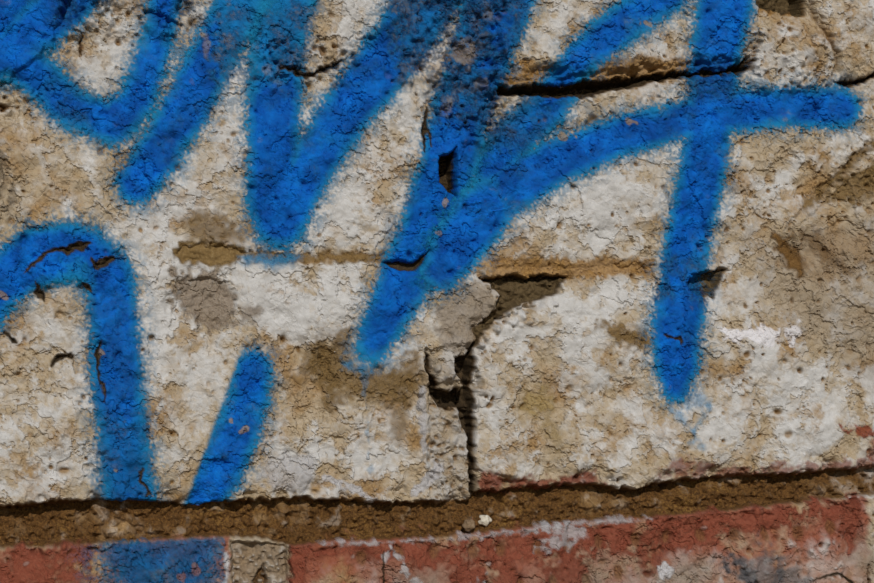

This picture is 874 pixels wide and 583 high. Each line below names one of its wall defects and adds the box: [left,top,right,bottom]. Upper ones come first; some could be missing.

crack [424,350,474,496]